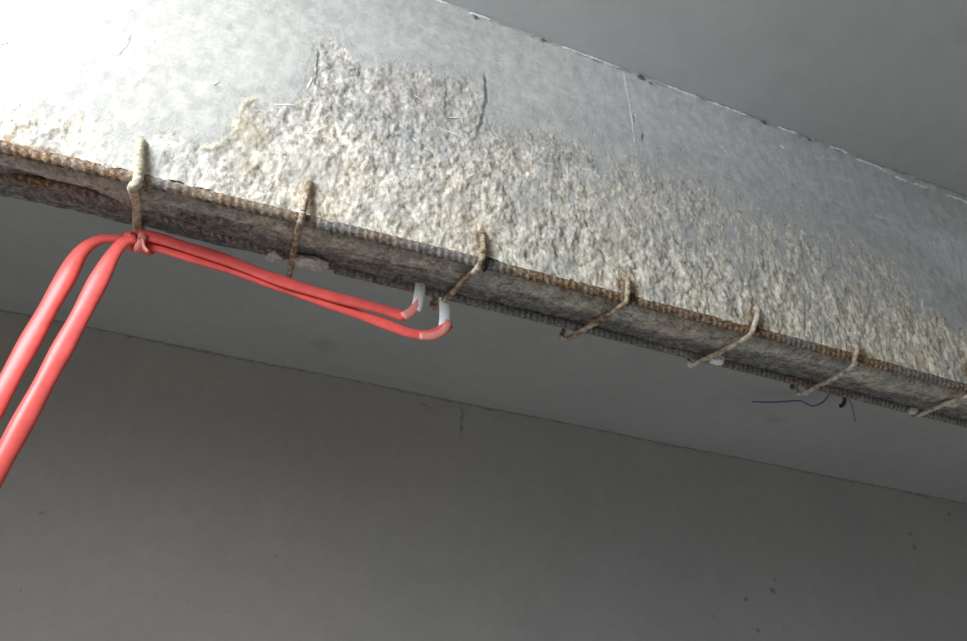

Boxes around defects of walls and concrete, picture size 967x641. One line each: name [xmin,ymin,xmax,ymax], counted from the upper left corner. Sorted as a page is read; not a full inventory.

crack [469,77,487,134]
spalling [0,26,967,428]